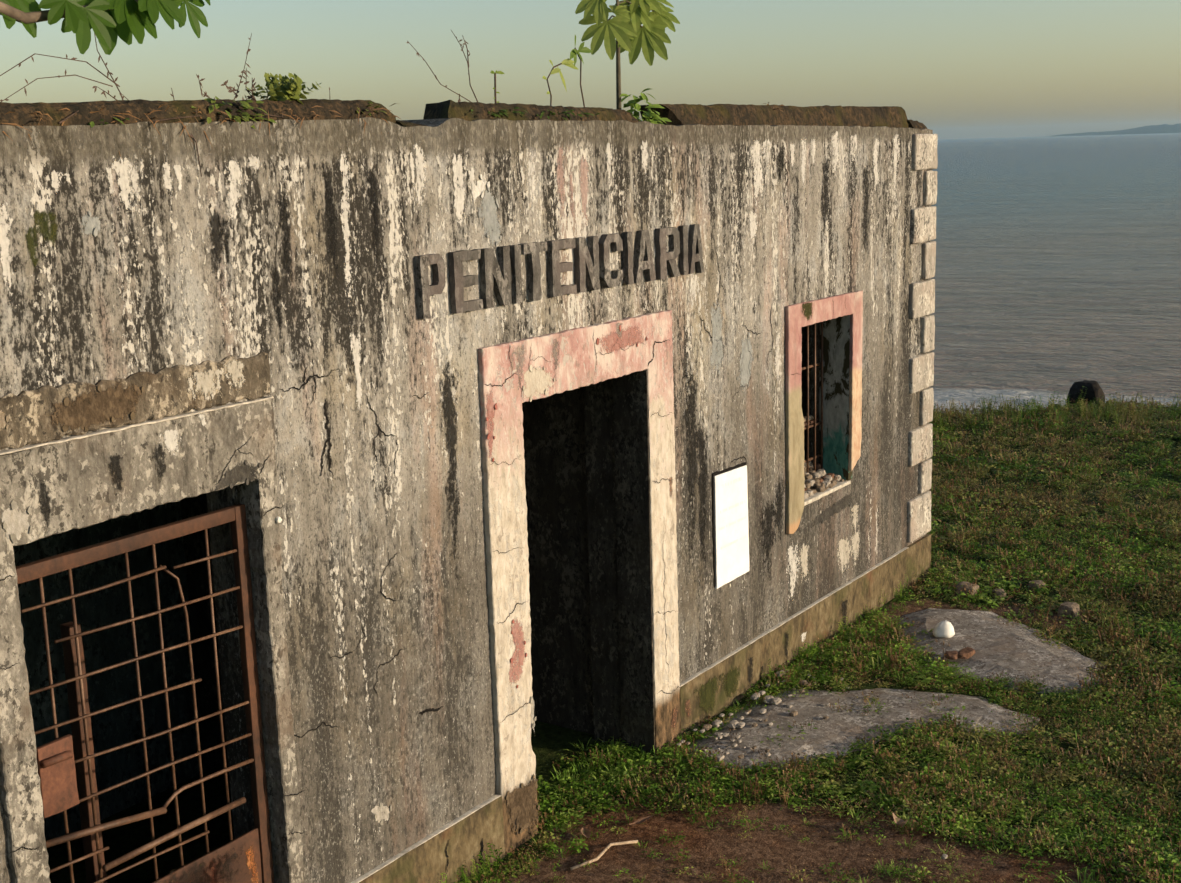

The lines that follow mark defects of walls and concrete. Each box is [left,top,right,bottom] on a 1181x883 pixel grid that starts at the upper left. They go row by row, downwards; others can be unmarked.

leakage [210,154,259,285]
leakage [321,152,354,306]
leakage [452,153,476,226]
leakage [749,131,880,261]
crack [281,364,341,476]
leakage [350,329,362,413]
peeling [523,365,555,402]
peeling [596,325,648,353]
leakage [439,361,461,594]
spalling [809,493,854,528]
peeling [509,619,527,688]
rust [246,845,258,883]